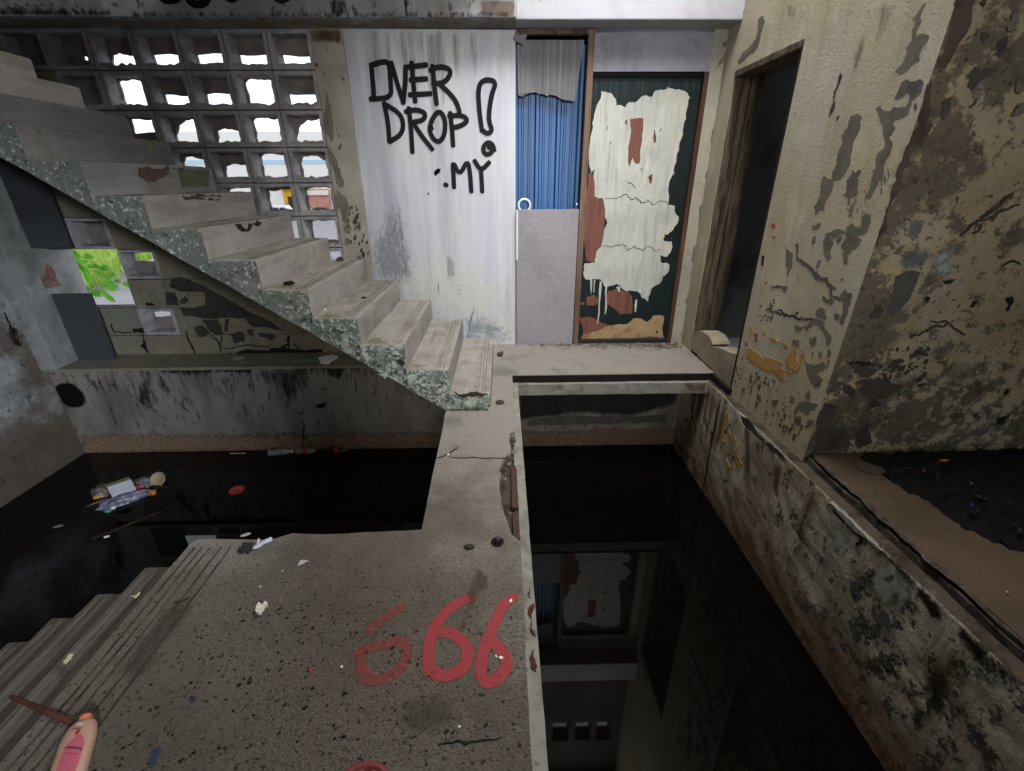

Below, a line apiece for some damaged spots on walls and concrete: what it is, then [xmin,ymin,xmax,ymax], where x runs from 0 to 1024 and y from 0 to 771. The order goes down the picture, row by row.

peeling [625,118,656,167]
peeling [812,3,952,281]
crack [959,192,1020,237]
crack [766,243,842,320]
crack [111,323,149,353]
crack [186,331,323,354]
leakage [139,359,344,408]
spalling [49,355,449,455]
leakage [79,409,442,453]
spalling [499,278,1024,771]
leakage [871,557,944,628]
mould [959,629,1006,679]